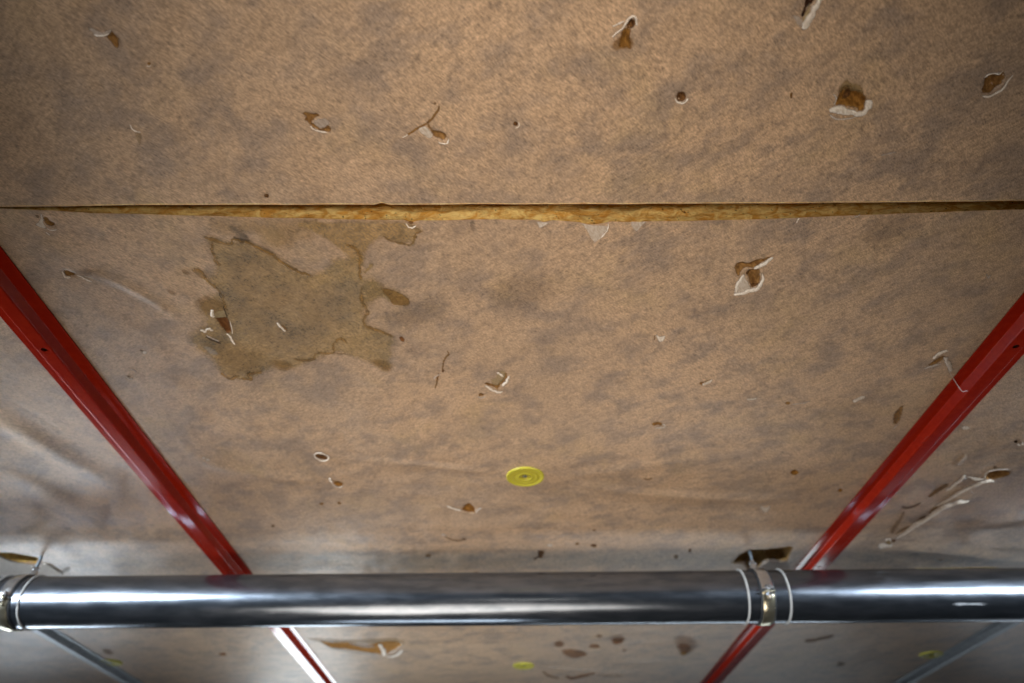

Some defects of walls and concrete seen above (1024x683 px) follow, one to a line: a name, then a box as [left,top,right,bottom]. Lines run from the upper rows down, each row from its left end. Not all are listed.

damp [192,222,422,381]